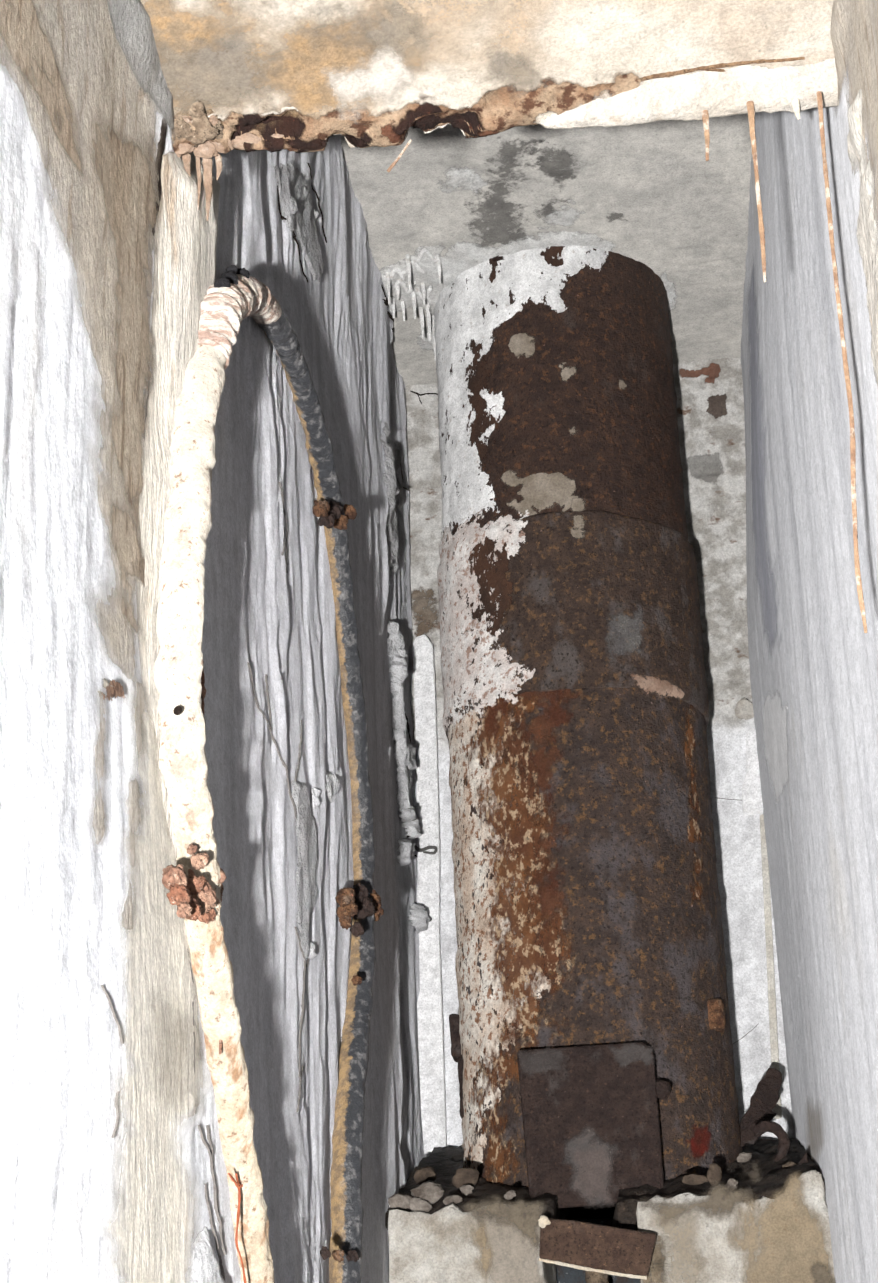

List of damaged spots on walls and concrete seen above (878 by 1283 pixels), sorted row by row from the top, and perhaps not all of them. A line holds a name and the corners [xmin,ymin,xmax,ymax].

damp [330,52,412,105]
crack [586,57,805,88]
spalling [172,72,641,281]
rust [487,255,504,283]
rust [540,246,565,267]
rust [462,340,500,469]
rust [466,536,516,637]
damp [380,0,878,1170]
rust [465,689,578,1184]
rust [565,1128,615,1205]
damp [467,1200,542,1283]
damp [642,1176,829,1283]